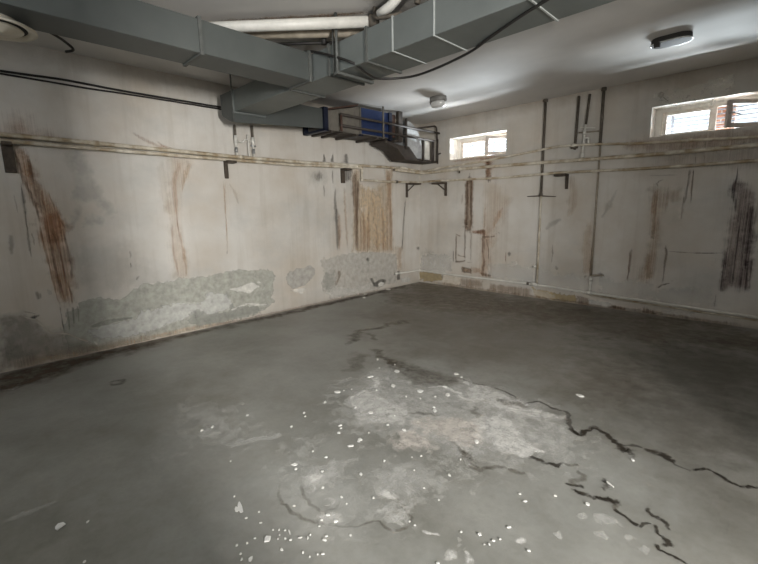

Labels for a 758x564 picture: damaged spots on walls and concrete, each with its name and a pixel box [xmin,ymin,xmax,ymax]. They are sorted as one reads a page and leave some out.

corrosion [15,148,79,329]
peeling [63,269,276,353]
peeling [286,252,410,299]
corrosion [345,169,393,253]
corrosion [463,173,499,277]
leakage [719,169,757,291]
crack [463,379,758,489]
crack [452,442,687,564]